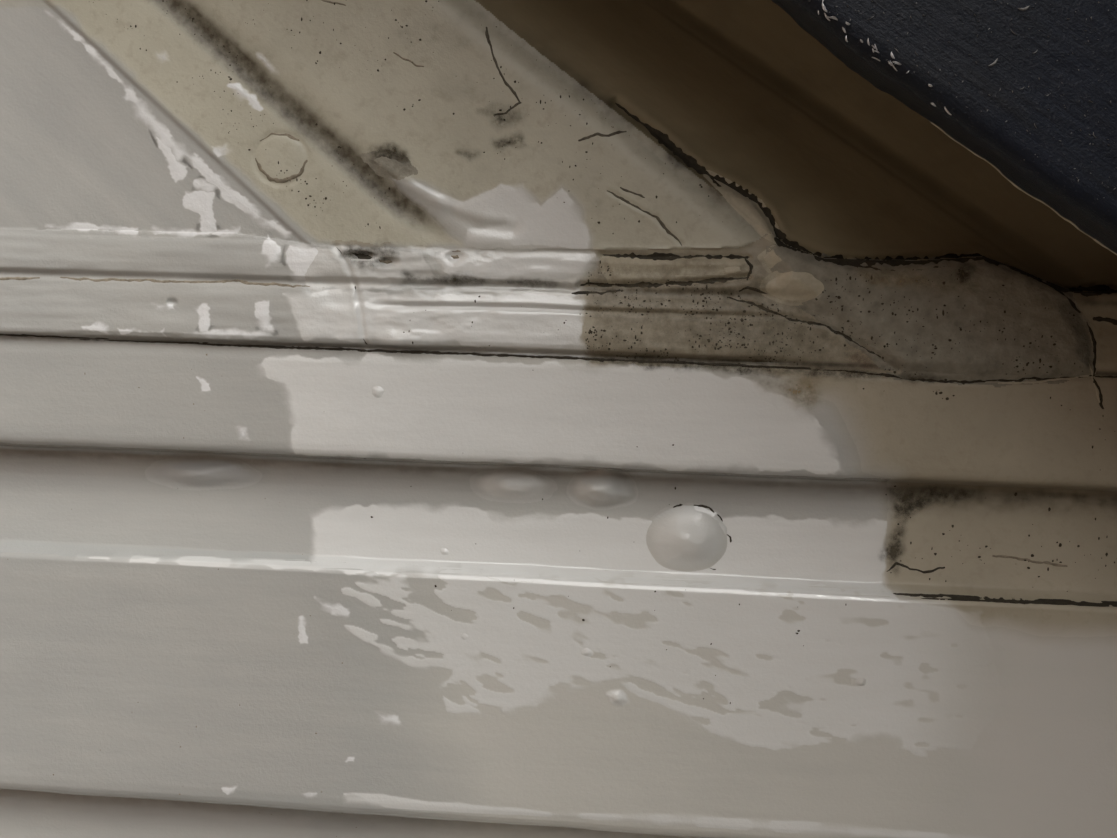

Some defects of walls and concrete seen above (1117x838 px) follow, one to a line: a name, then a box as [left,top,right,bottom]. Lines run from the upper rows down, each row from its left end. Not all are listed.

crack [485,27,521,116]
crack [0,103,1117,409]
water stain [583,260,1059,395]